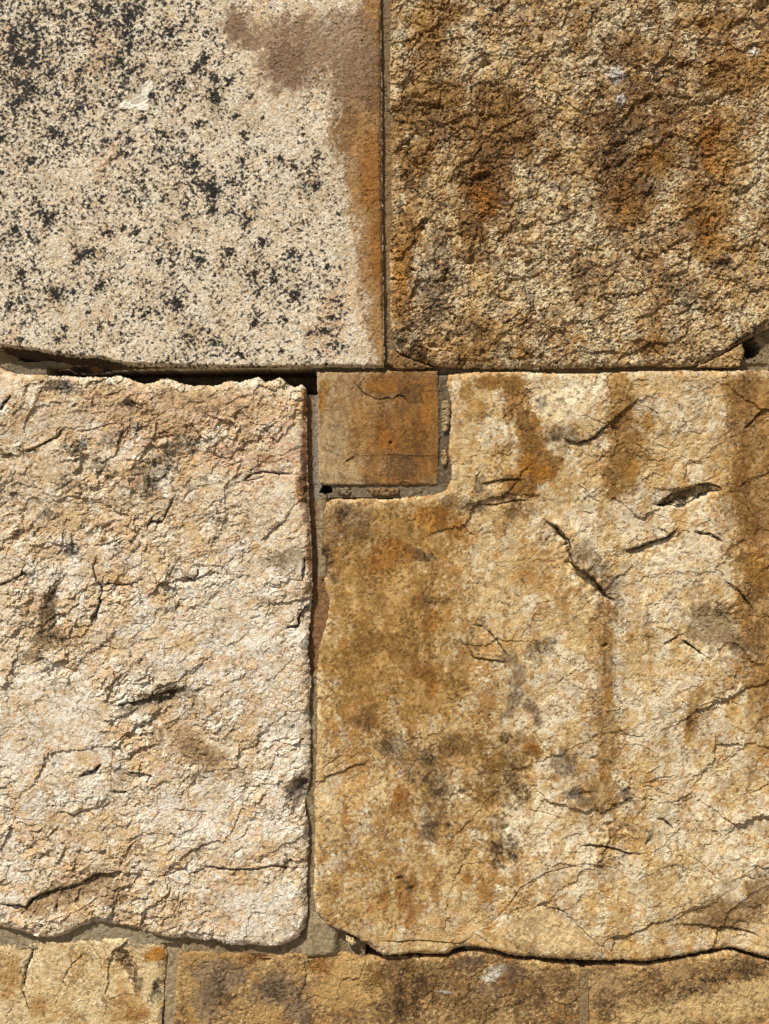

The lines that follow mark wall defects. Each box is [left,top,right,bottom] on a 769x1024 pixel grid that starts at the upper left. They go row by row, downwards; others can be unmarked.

damp [219,3,381,112]
crack [565,425,619,444]
crack [543,518,617,598]
crack [623,483,723,553]